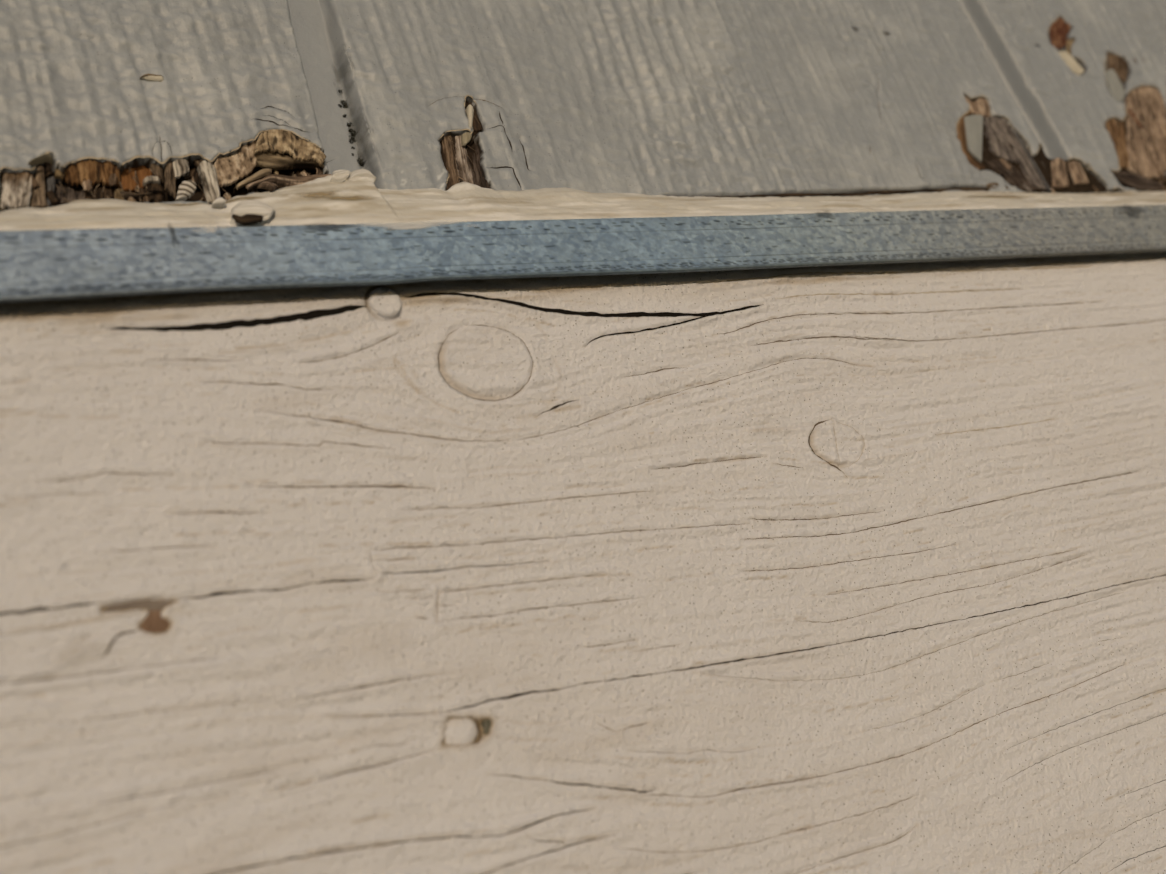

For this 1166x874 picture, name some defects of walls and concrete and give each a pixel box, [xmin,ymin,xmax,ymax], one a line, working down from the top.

peeling [1048,15,1086,75]
peeling [1105,47,1152,103]
peeling [28,154,53,166]
peeling [461,105,474,146]
peeling [964,115,983,163]
crack [110,305,366,331]
crack [154,266,1166,448]
crack [0,602,103,616]
peeling [101,600,175,657]
crack [171,472,1166,744]
crack [217,636,1127,874]
crack [1003,688,1166,782]